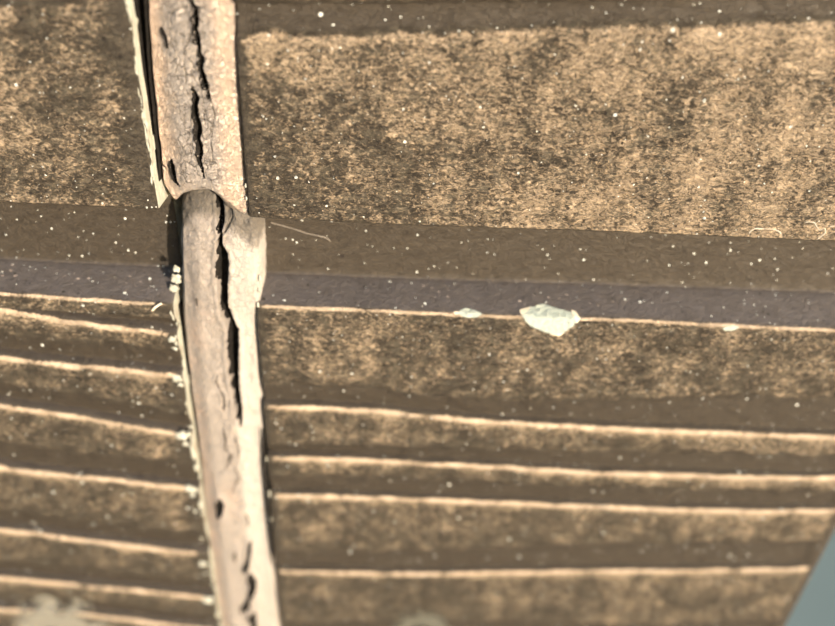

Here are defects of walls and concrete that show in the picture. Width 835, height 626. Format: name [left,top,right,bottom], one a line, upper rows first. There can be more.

crack [160,0,216,186]
crack [215,194,242,519]
peeling [518,294,580,336]
crack [233,513,257,626]